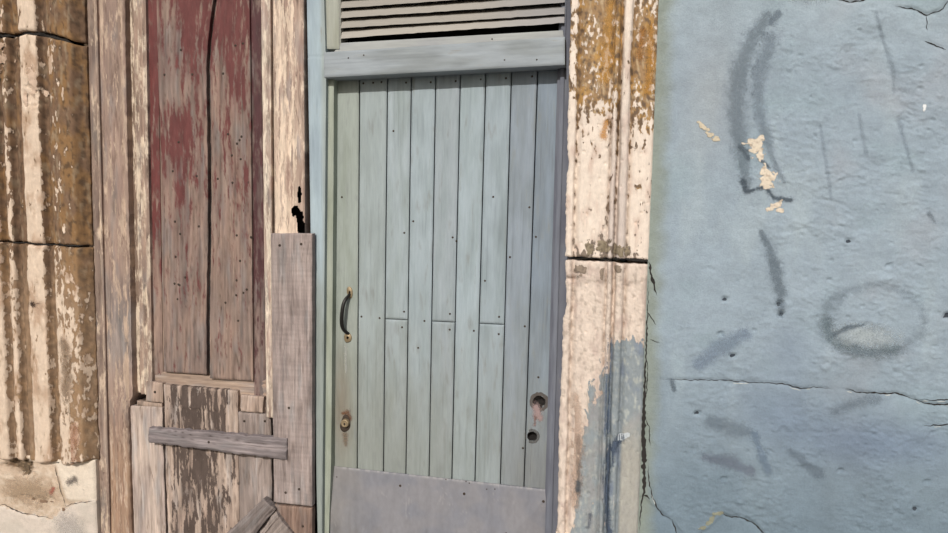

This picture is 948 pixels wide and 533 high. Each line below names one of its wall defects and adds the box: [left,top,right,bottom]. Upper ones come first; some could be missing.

crack [897,1,948,50]
peeling [741,135,778,189]
leakage [741,179,793,202]
peeling [766,199,784,213]
crack [577,257,822,533]
crack [847,389,948,427]